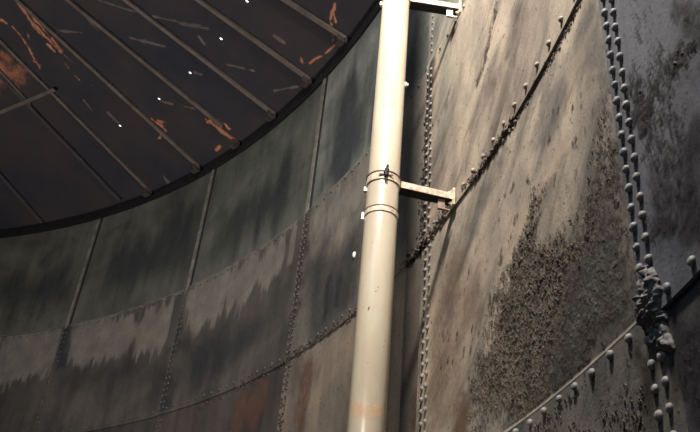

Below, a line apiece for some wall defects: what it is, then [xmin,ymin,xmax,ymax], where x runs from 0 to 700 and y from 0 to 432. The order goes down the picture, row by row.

rust [18,4,62,54]
leakage [0,148,370,391]